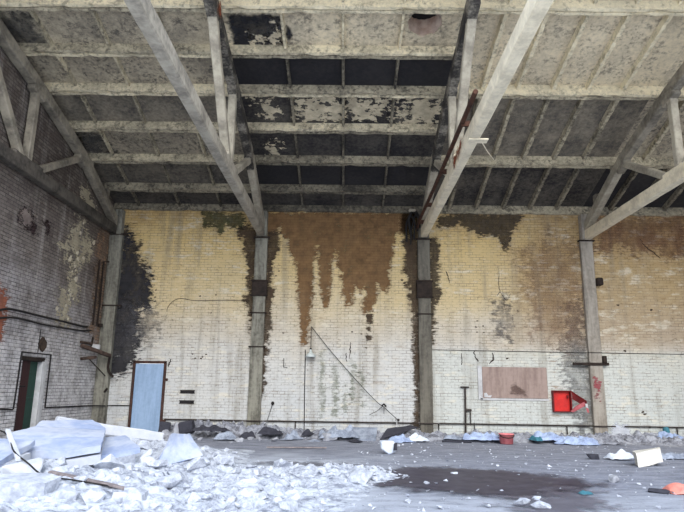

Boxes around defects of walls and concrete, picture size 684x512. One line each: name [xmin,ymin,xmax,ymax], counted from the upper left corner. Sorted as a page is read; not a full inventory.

peeling [245,21,282,45]
spalling [245,96,284,120]
spalling [293,97,443,124]
flaking render [0,283,11,342]
peeling [55,212,110,344]
leakage [201,211,257,330]
leakage [262,212,420,430]
leakage [430,213,525,345]